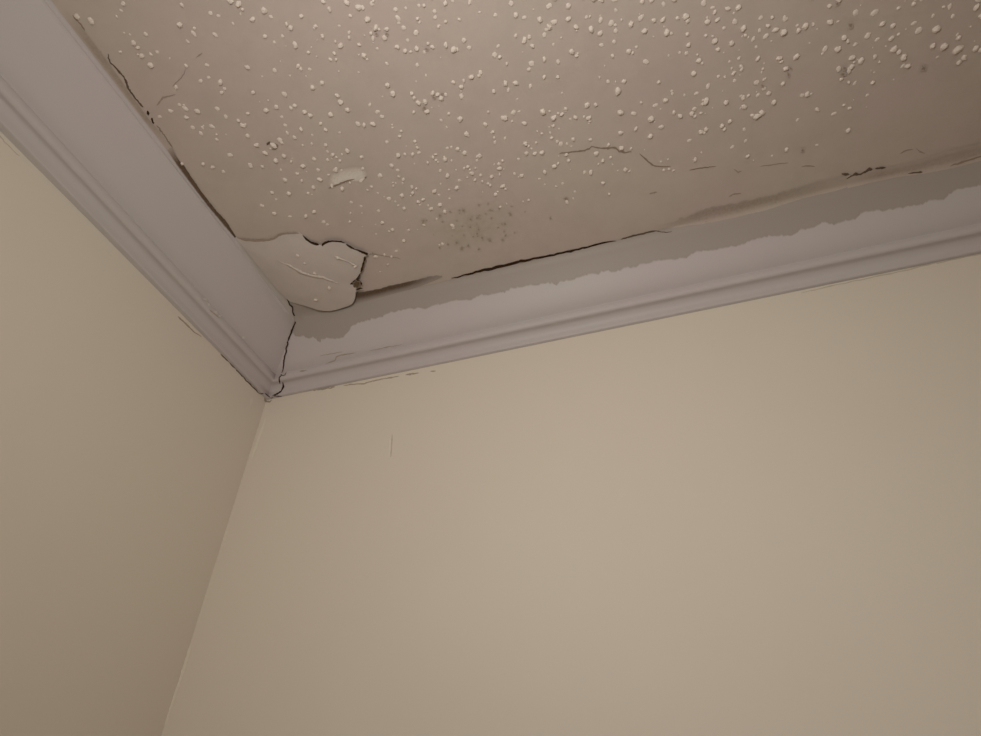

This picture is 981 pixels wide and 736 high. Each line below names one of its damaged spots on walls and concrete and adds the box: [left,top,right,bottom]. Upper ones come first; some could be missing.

crack [108,53,202,147]
crack [303,236,400,290]
crack [453,231,668,278]
crack [221,300,296,398]